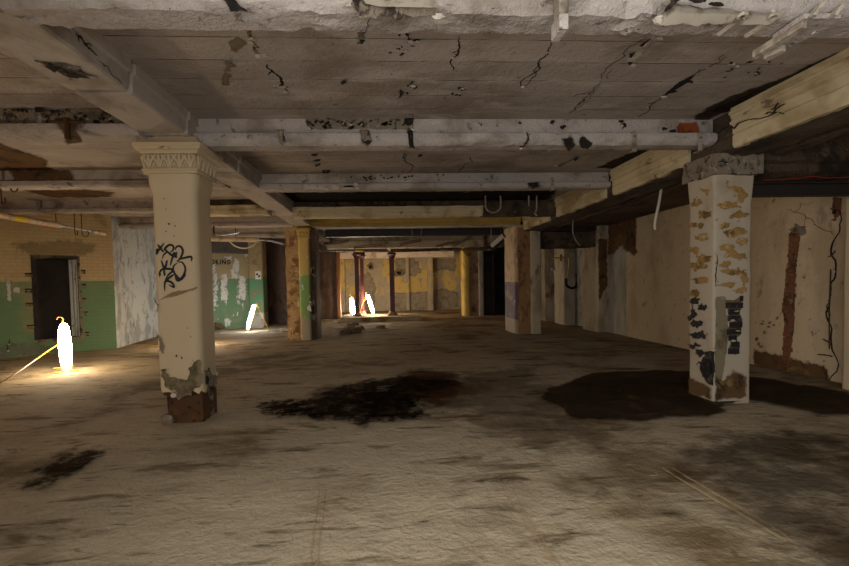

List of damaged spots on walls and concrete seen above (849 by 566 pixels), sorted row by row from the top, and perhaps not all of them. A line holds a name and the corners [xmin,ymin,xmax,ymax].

spalling [652,0,779,26]
spalling [34,60,97,79]
crack [520,42,552,89]
crack [570,36,646,113]
peeling [212,255,247,307]
peeling [359,272,376,310]
peeling [395,288,459,310]
peeling [433,259,456,272]
peeling [687,180,749,385]
flaking render [755,223,807,371]
crack [786,202,842,380]
spalling [161,360,218,398]